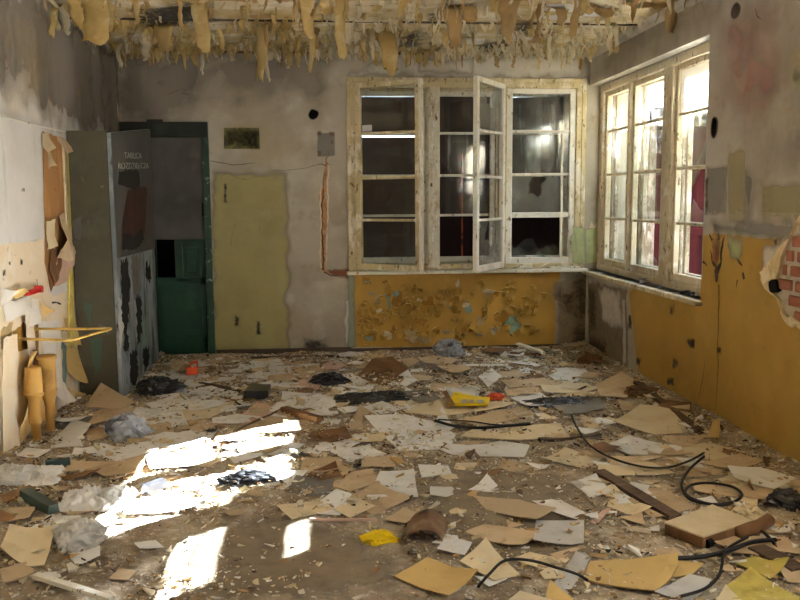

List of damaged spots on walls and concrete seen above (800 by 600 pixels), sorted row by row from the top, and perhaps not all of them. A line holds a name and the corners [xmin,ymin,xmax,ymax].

peeling [0,288,88,457]
peeling [344,275,547,348]
leakage [554,273,640,366]
crack [698,233,745,410]
spalling [759,215,800,329]